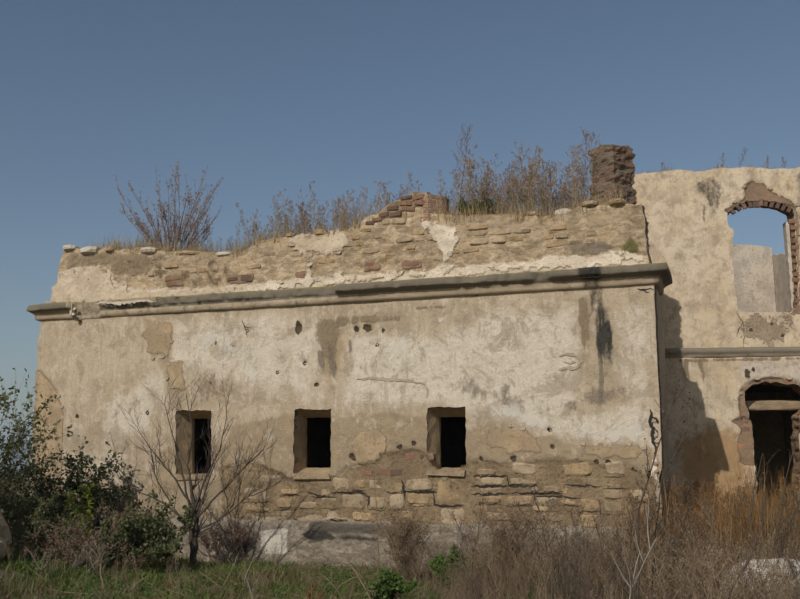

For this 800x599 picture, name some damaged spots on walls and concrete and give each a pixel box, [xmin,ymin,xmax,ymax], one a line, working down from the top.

flaking render [165,275,183,287]
flaking render [226,273,253,283]
flaking render [364,261,380,271]
flaking render [402,260,422,269]
flaking render [724,181,800,347]
leakage [578,266,614,403]
flaking render [351,427,402,477]
crack [648,409,659,456]
flaking render [732,376,797,466]
flaking render [650,457,659,503]